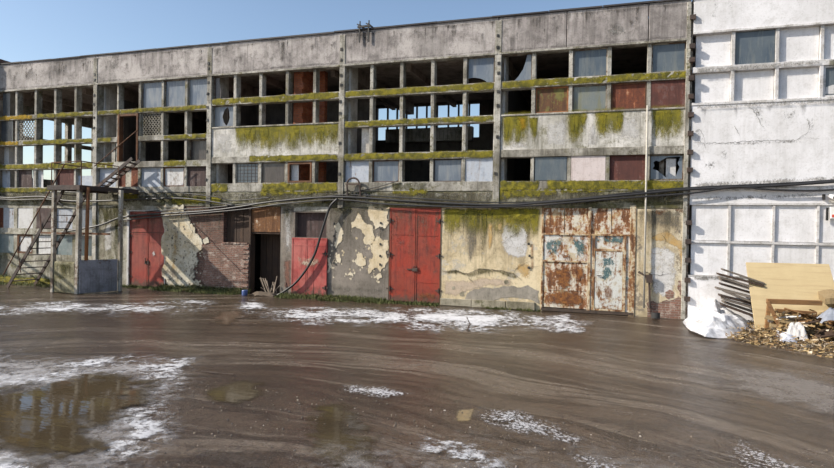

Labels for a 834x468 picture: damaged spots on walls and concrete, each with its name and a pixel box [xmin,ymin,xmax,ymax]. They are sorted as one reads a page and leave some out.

leakage [504,117,538,147]
leakage [547,114,607,144]
crack [695,108,819,148]
spalling [153,204,209,287]
peeling [299,207,389,283]
crack [443,232,527,281]
leakage [500,214,535,257]
corrosion [548,254,584,305]